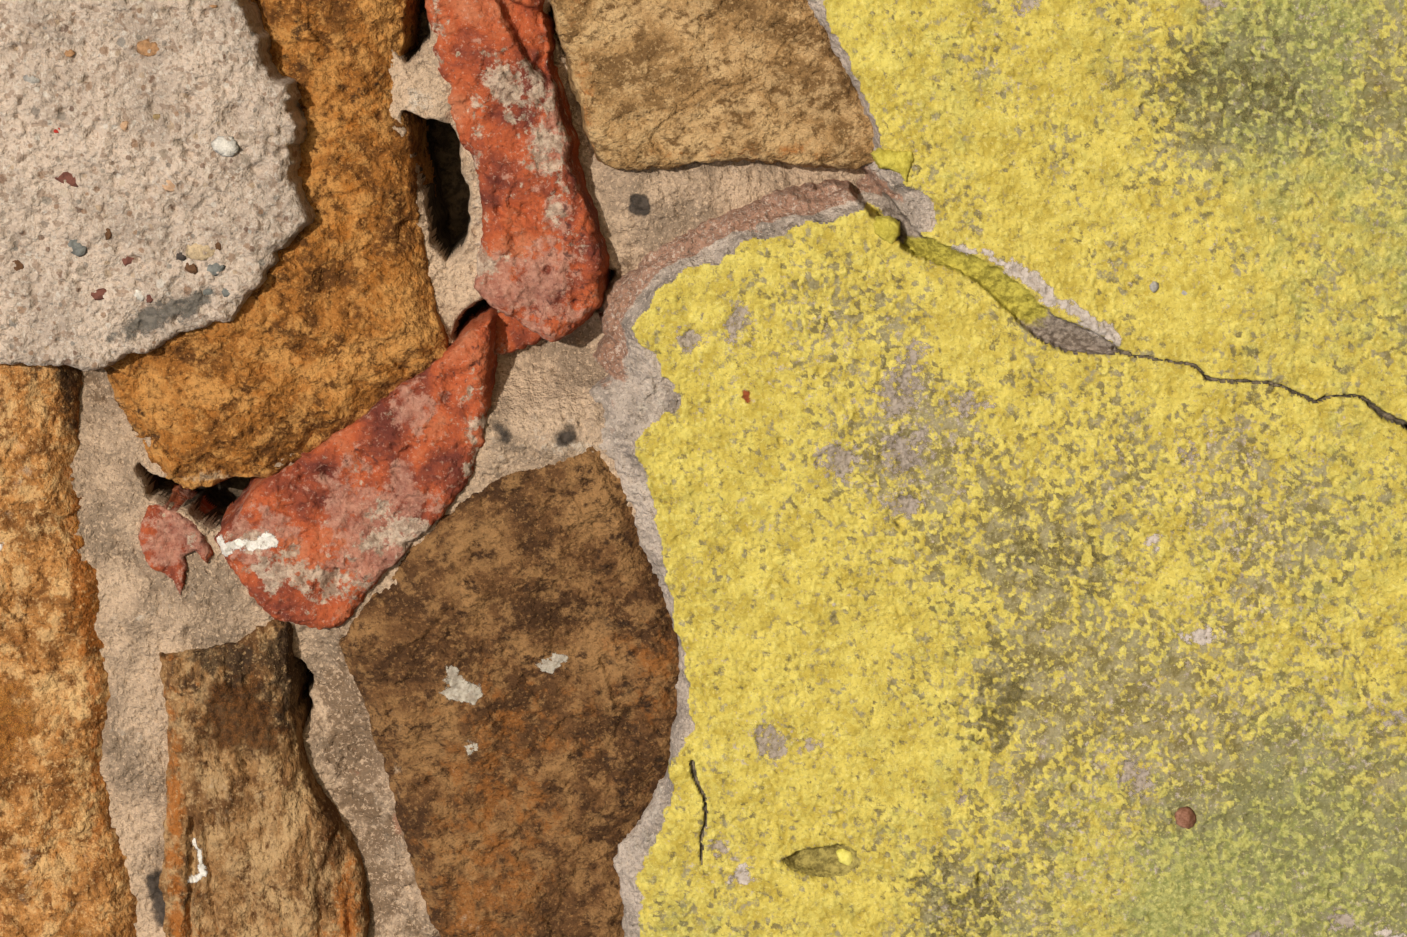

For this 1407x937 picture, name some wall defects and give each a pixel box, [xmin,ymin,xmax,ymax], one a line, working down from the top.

crack [882,192,1407,430]
flaking render [589,0,937,937]
crack [689,760,709,865]